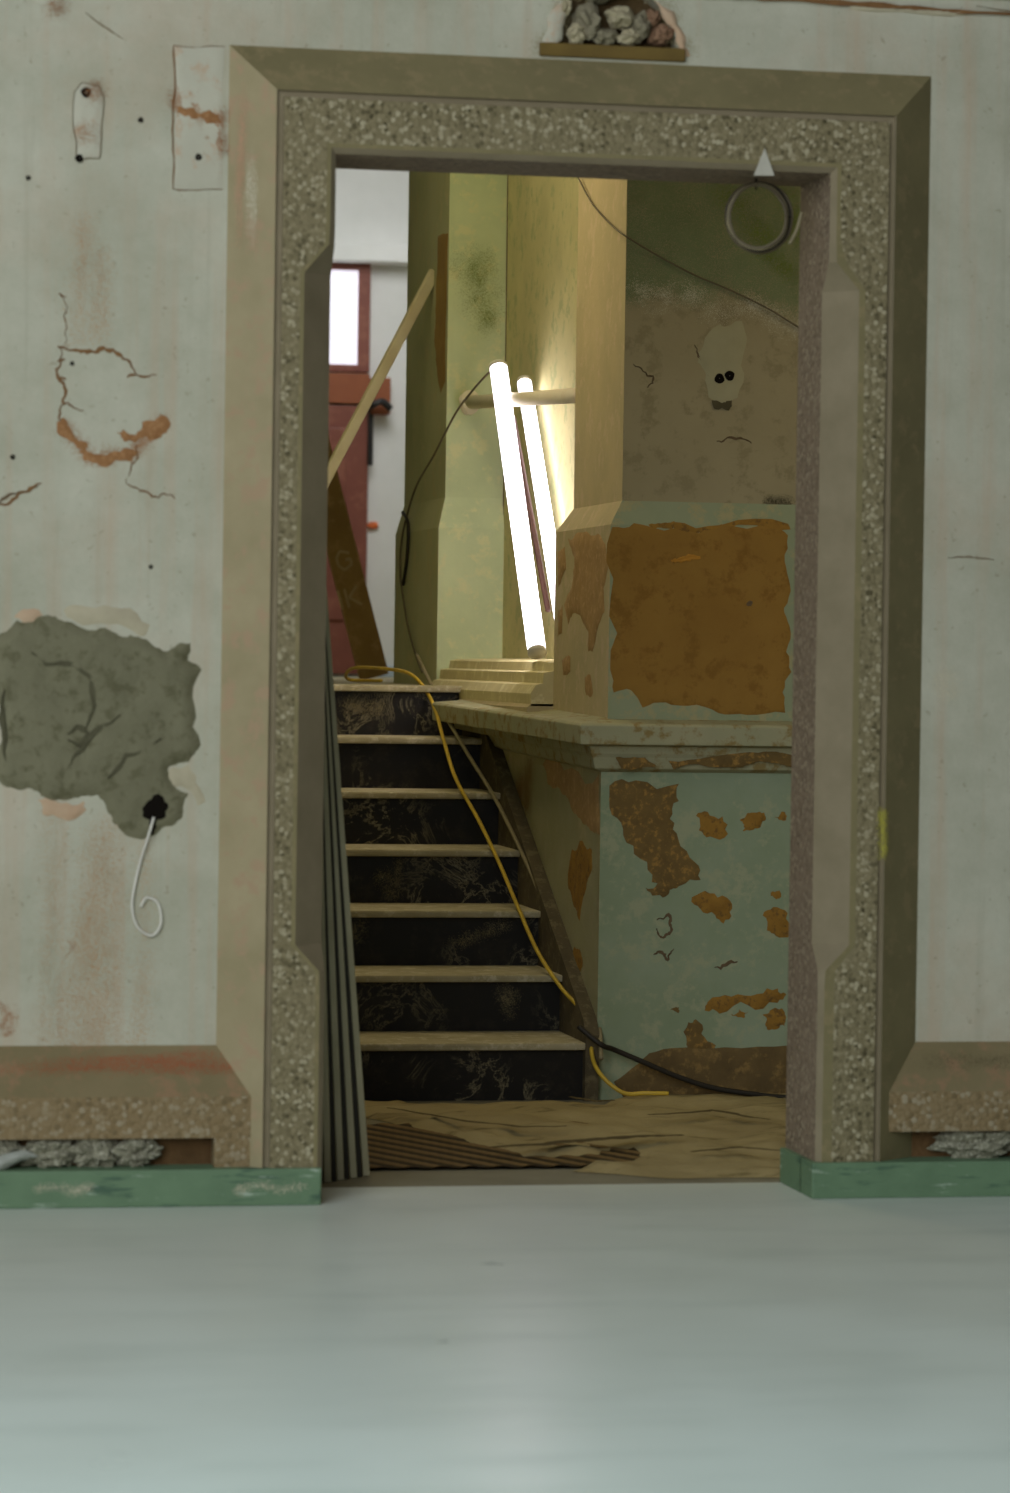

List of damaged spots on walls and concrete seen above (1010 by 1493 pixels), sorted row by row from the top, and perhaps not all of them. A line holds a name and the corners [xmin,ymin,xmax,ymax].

spalling [526,0,701,64]
peeling [557,519,791,715]
peeling [543,752,792,924]
peeling [763,890,789,938]
peeling [614,988,787,1097]